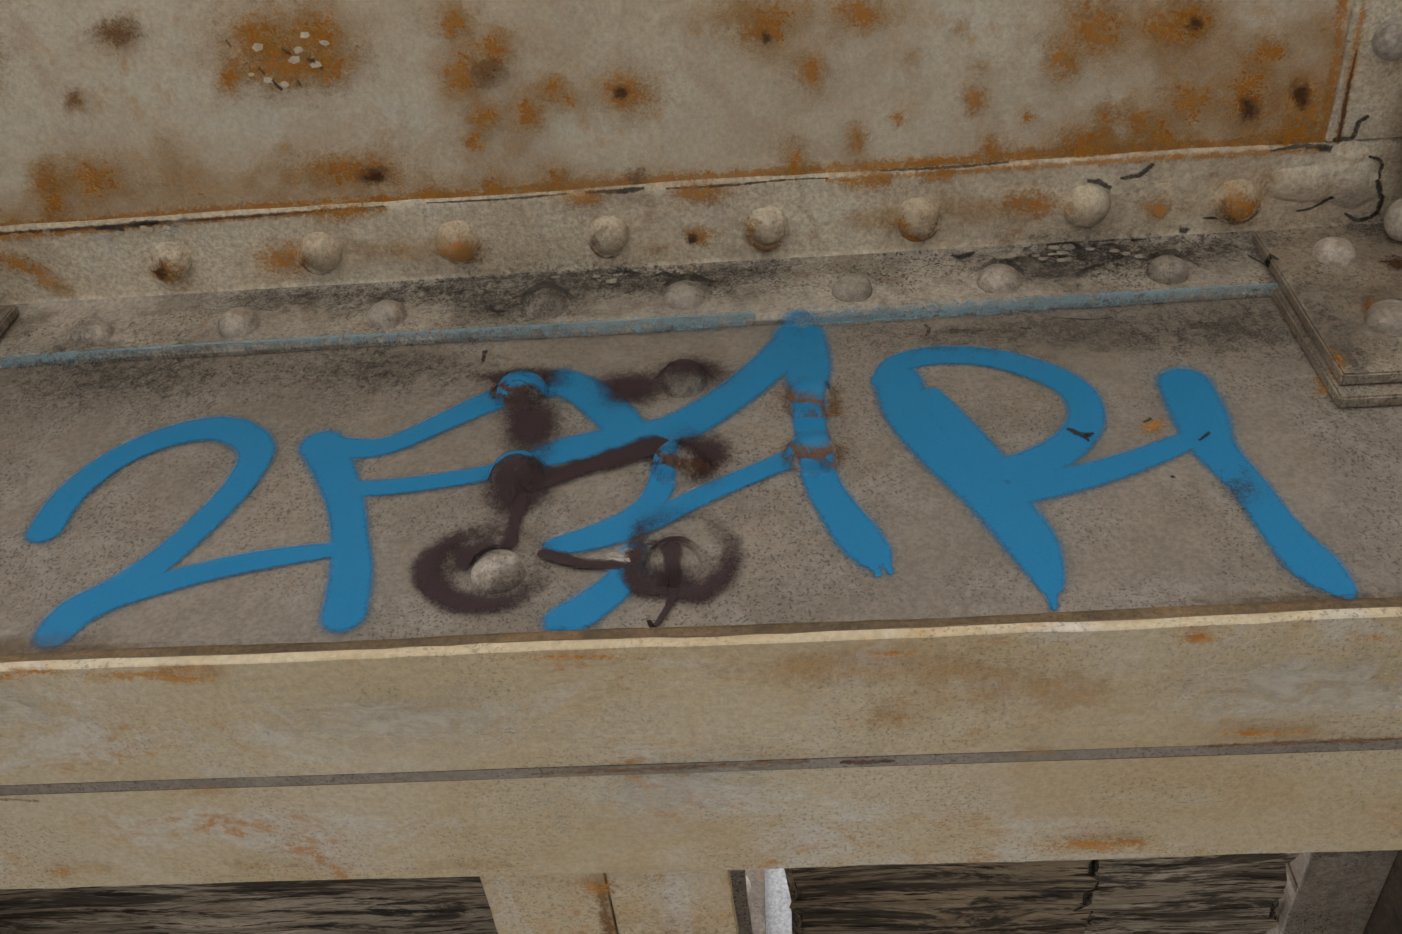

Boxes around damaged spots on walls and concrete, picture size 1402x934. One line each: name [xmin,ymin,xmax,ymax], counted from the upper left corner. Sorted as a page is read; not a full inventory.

corrosion [0,0,1366,289]
corrosion [1197,729,1402,748]
corrosion [531,760,810,775]